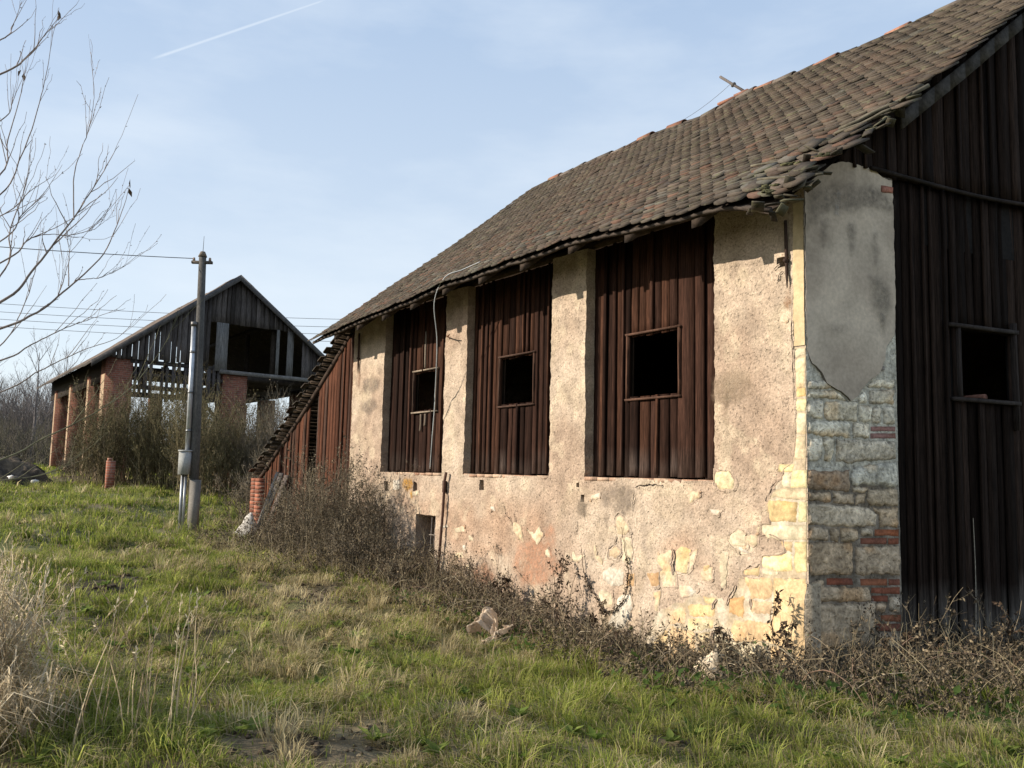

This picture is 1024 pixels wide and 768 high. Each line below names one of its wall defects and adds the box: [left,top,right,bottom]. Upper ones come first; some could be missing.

spalling [513,521,551,558]
spalling [572,92,922,681]